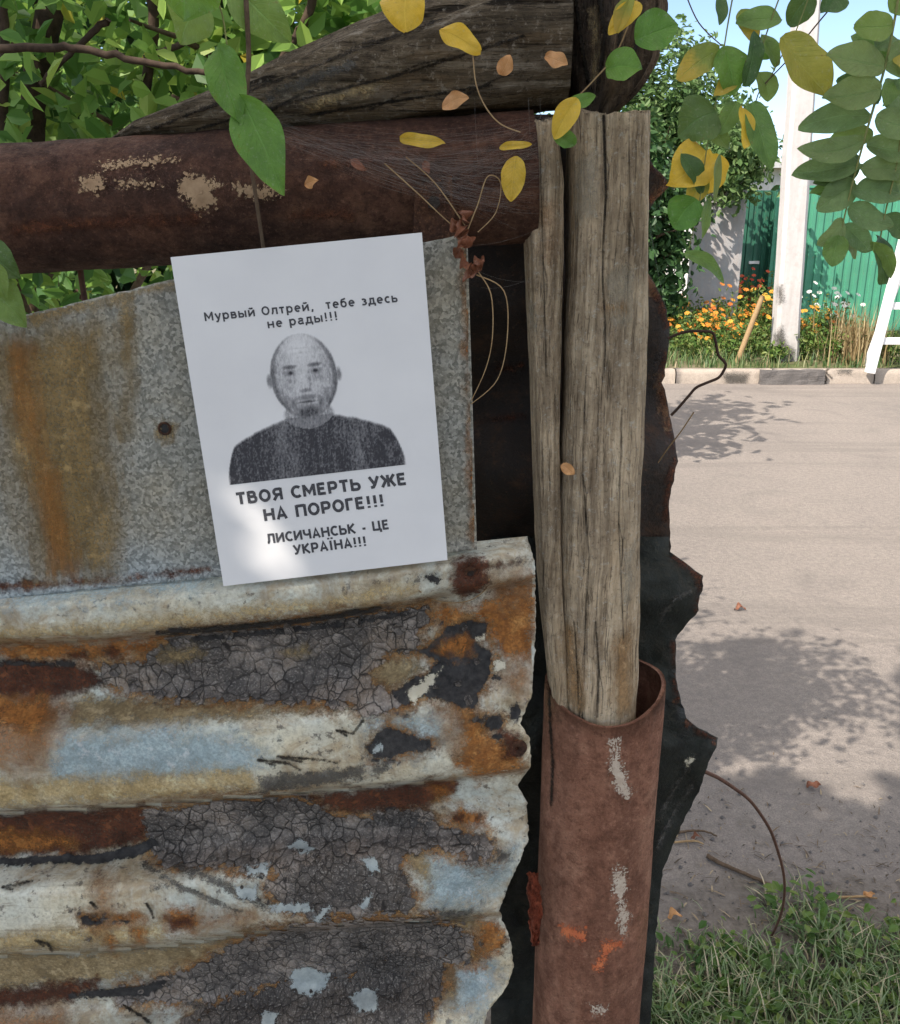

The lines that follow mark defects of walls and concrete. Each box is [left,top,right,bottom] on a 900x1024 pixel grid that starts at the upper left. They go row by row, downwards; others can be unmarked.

peeling [78,152,288,218]
rust [0,585,418,858]
crack [89,597,437,737]
rust [304,439,536,829]
peeling [405,667,443,705]
peeling [493,659,507,671]
crack [112,755,501,1024]